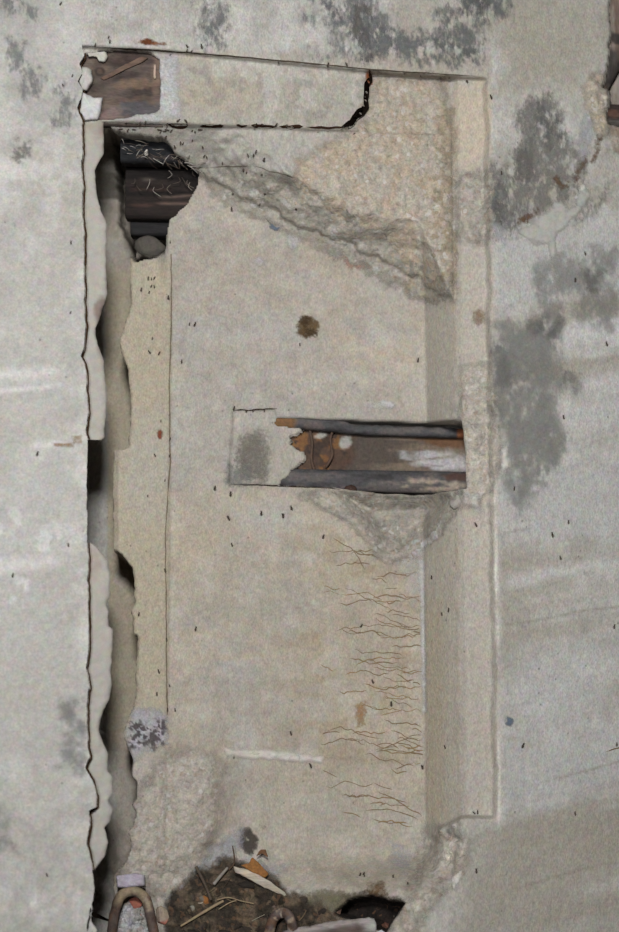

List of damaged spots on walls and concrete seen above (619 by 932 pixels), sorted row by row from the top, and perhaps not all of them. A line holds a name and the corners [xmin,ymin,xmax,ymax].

leakage [207,6,226,47]
leakage [325,0,512,66]
crack [78,46,480,444]
spalling [195,71,494,301]
leakage [490,92,593,237]
crack [235,483,341,491]
spalling [300,362,509,564]
leakage [495,310,574,503]
crack [85,504,108,931]
crack [320,539,423,827]
spalling [387,824,469,932]